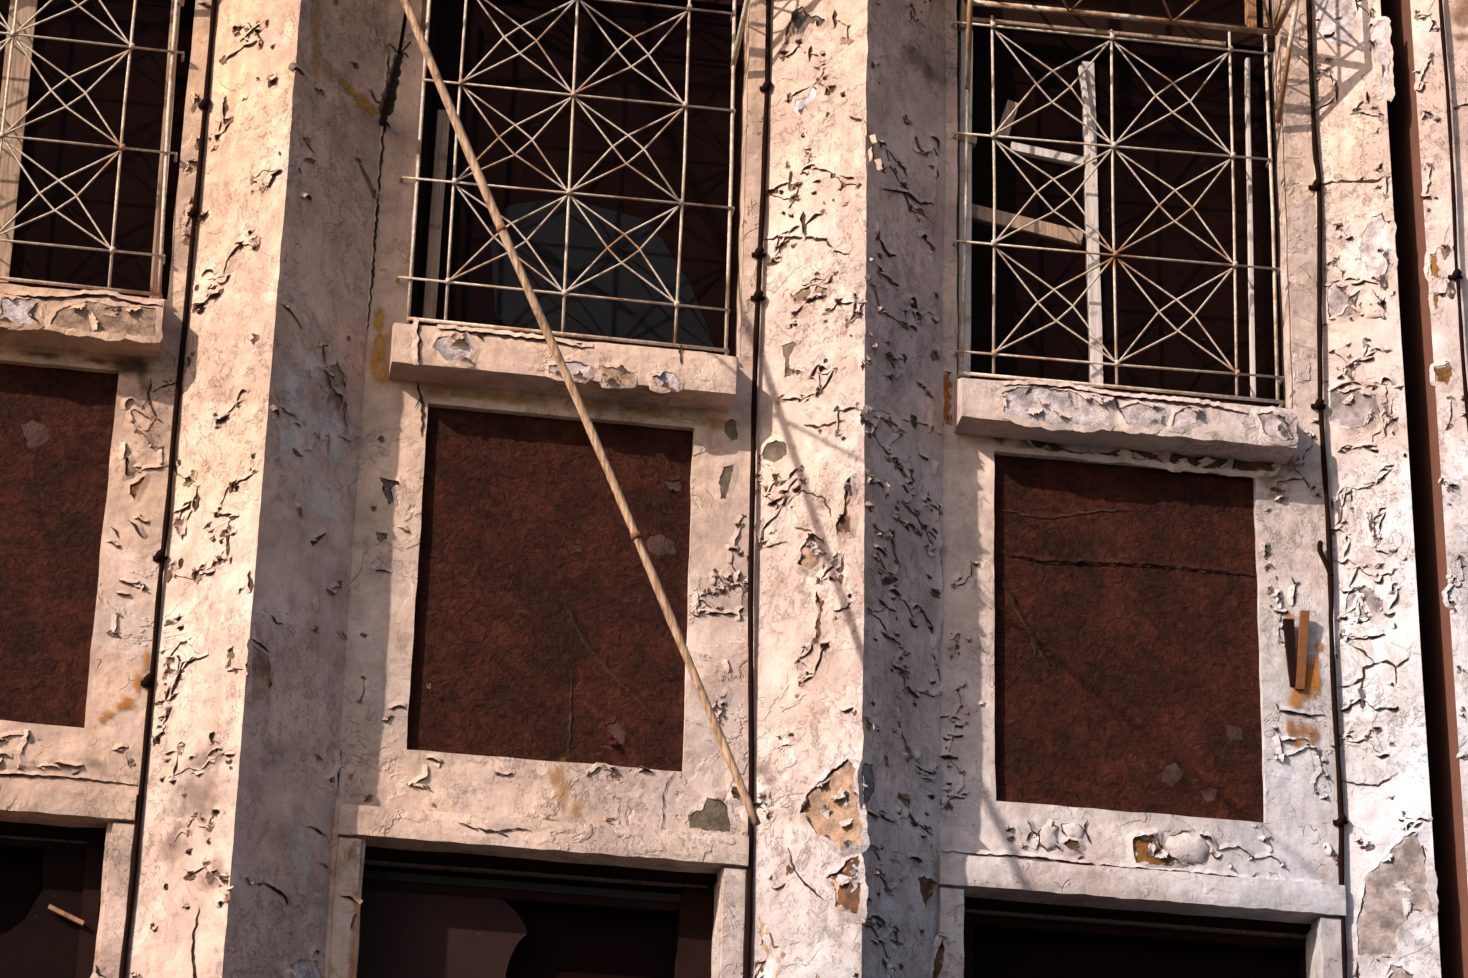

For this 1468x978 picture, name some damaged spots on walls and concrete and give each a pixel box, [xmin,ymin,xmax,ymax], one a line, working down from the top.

peeling [876,113,941,254]
peeling [1315,160,1398,326]
peeling [428,330,481,368]
spalling [689,412,808,621]
peeling [994,337,1407,659]
peeling [775,252,987,978]
spalling [682,784,775,835]
peeling [750,910,791,978]
peeling [1200,822,1286,868]
corrosion [1287,643,1322,747]
peeling [1272,682,1399,800]
peeling [1351,794,1439,978]